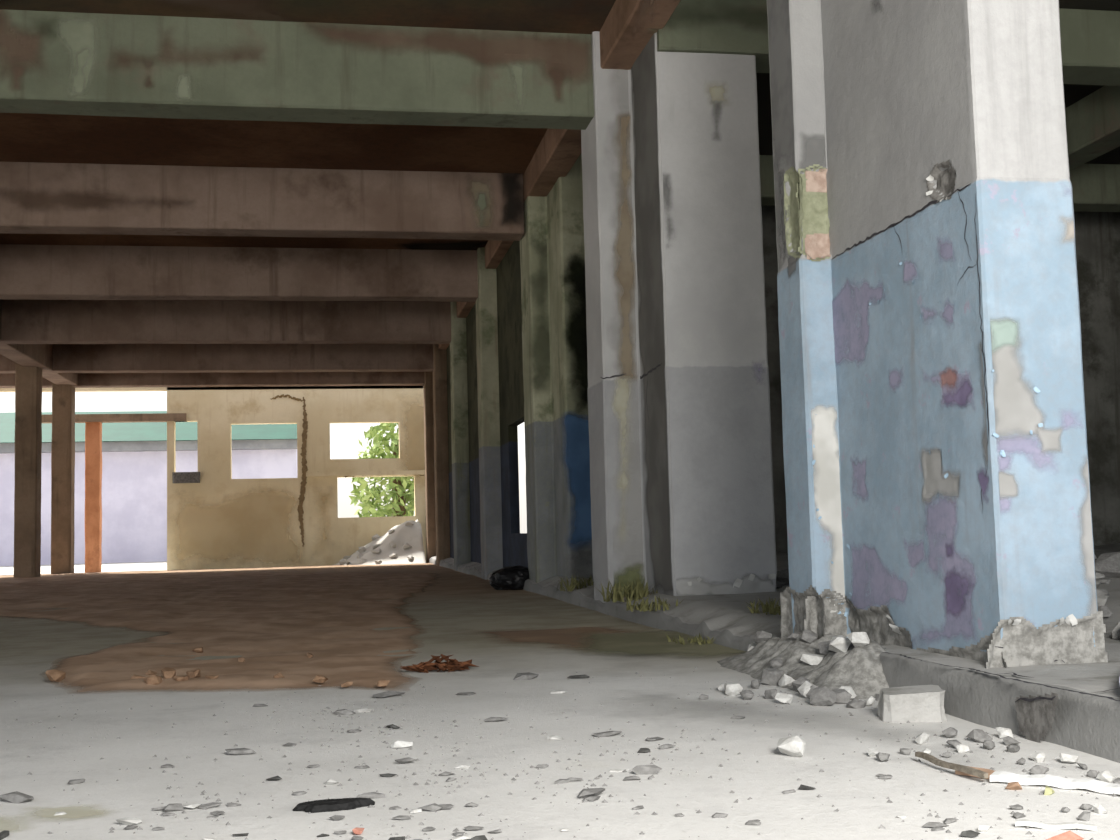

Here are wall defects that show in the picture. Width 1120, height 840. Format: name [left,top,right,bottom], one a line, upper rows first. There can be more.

leakage [42,20,96,93]
mould [532,272,550,388]
mould [563,255,588,408]
crack [831,183,989,510]
peeling [990,320,1062,451]
crack [270,394,308,547]
flaking render [676,406,1108,669]